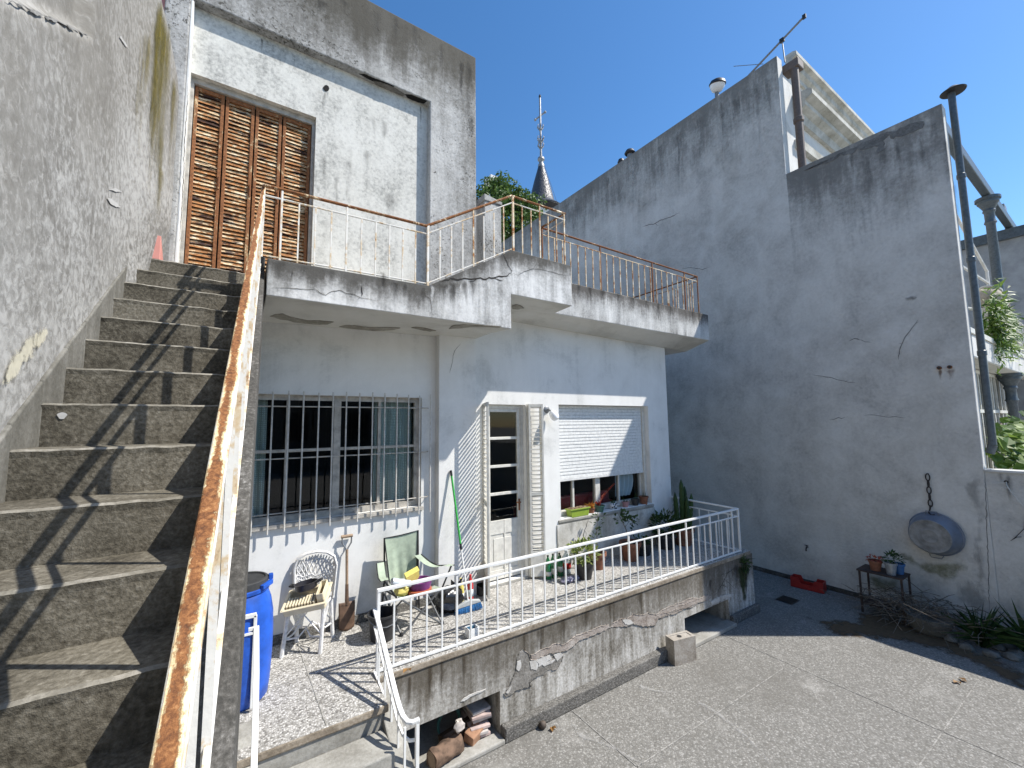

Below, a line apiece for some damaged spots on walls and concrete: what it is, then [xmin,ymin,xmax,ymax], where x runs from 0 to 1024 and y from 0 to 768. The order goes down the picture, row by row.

water stain [143,10,176,156]
crack [274,269,375,301]
crack [420,256,562,307]
peeling [270,313,436,332]
peeling [3,329,48,383]
spalling [504,594,734,697]